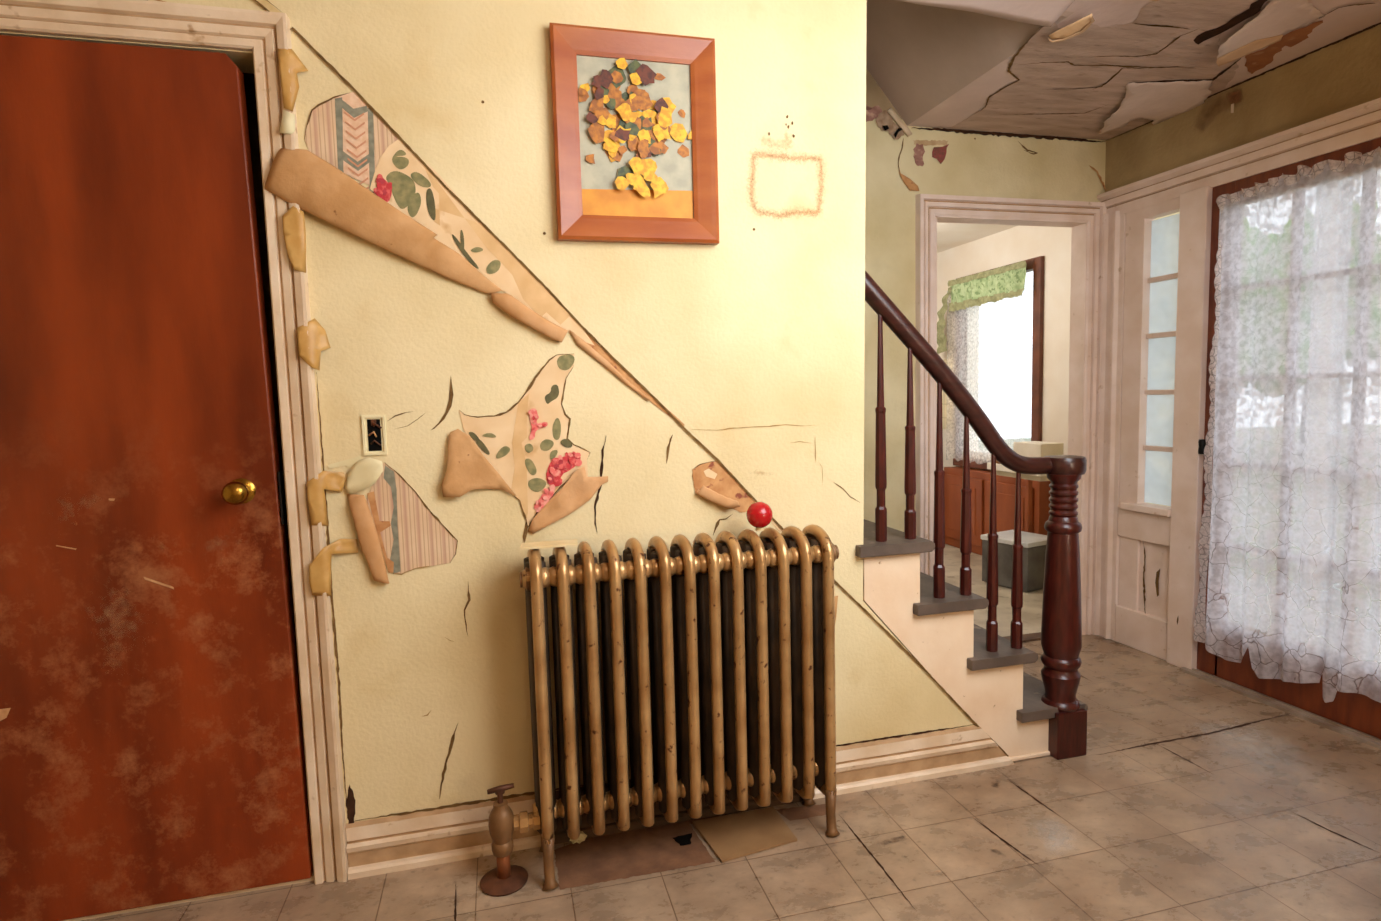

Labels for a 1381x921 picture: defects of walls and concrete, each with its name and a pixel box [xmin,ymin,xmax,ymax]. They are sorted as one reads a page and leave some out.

crack [1020,23,1197,115]
flaking render [1245,20,1323,74]
flaking render [866,105,949,166]
crack [255,0,859,530]
crack [1143,543,1179,624]
crack [834,579,1059,816]